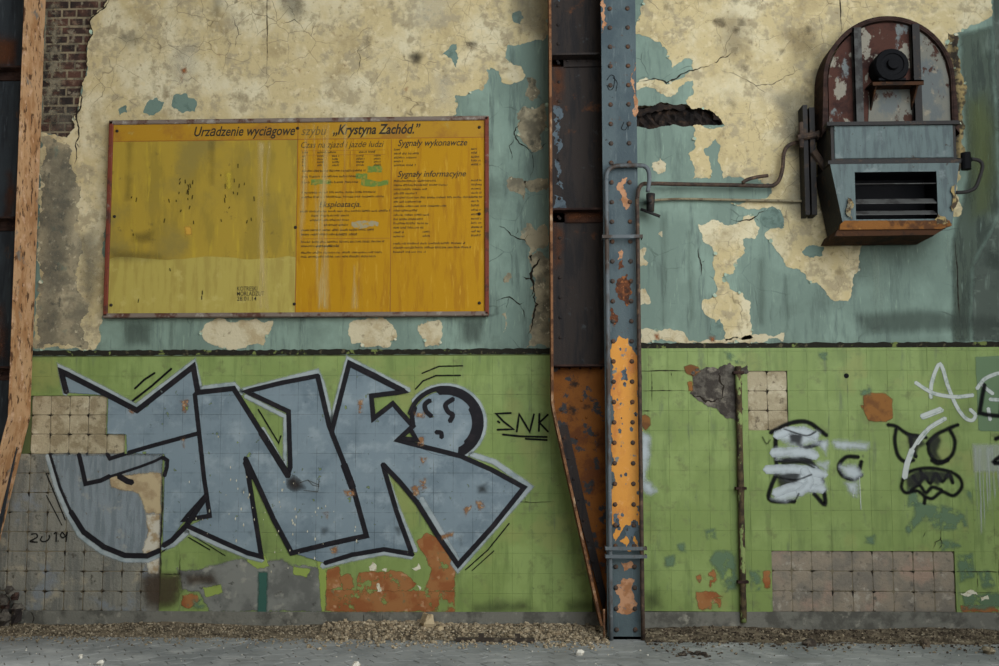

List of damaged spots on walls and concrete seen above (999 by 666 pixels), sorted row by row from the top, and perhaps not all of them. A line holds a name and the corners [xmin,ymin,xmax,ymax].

peeling [33,0,550,351]
crack [637,53,795,89]
peeling [636,0,993,347]
peeling [0,396,163,611]
peeling [325,533,461,612]
peeling [690,363,788,430]